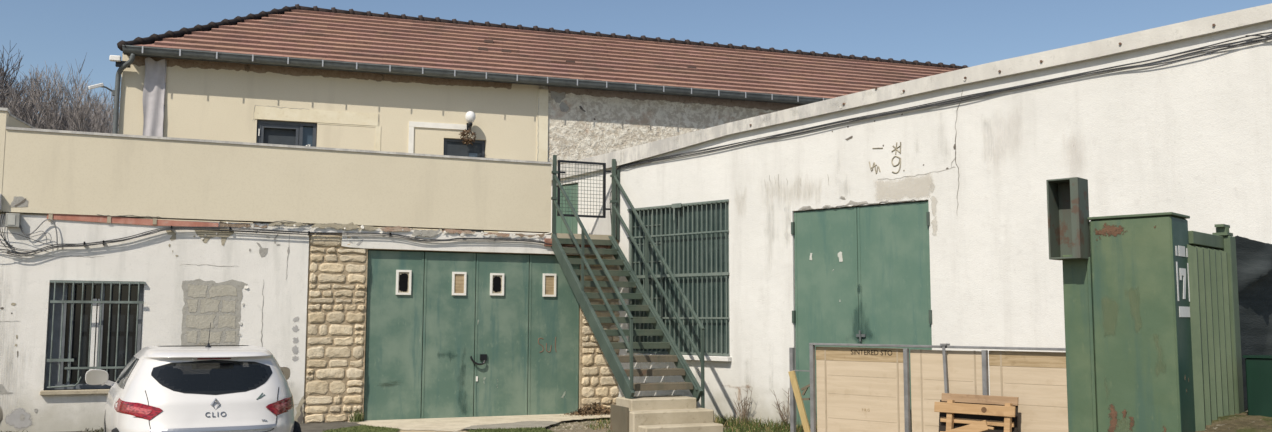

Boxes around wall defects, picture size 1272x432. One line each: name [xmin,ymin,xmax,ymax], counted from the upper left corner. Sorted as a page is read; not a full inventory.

peeling [181,279,249,345]